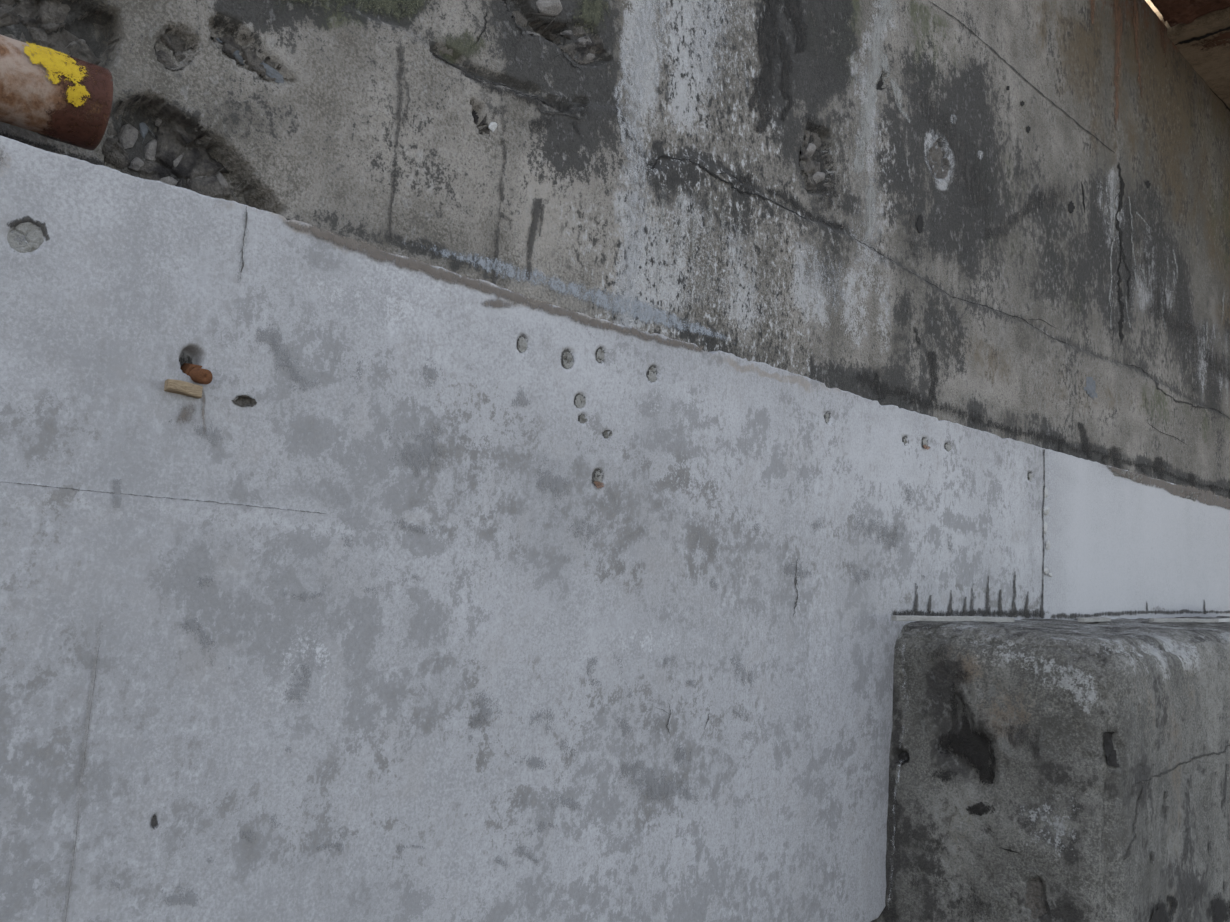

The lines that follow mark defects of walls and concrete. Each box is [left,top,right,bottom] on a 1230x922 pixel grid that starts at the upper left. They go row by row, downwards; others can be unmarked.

spalling [155,27,194,71]
spalling [211,27,288,83]
leakage [776,0,808,120]
leakage [853,0,911,173]
spalling [799,129,832,190]
crack [854,238,1069,345]
crack [1114,163,1229,418]
leakage [913,327,939,403]
leakage [1078,422,1121,469]
spalling [938,683,995,785]
spalling [966,802,995,816]
crack [1123,745,1230,860]